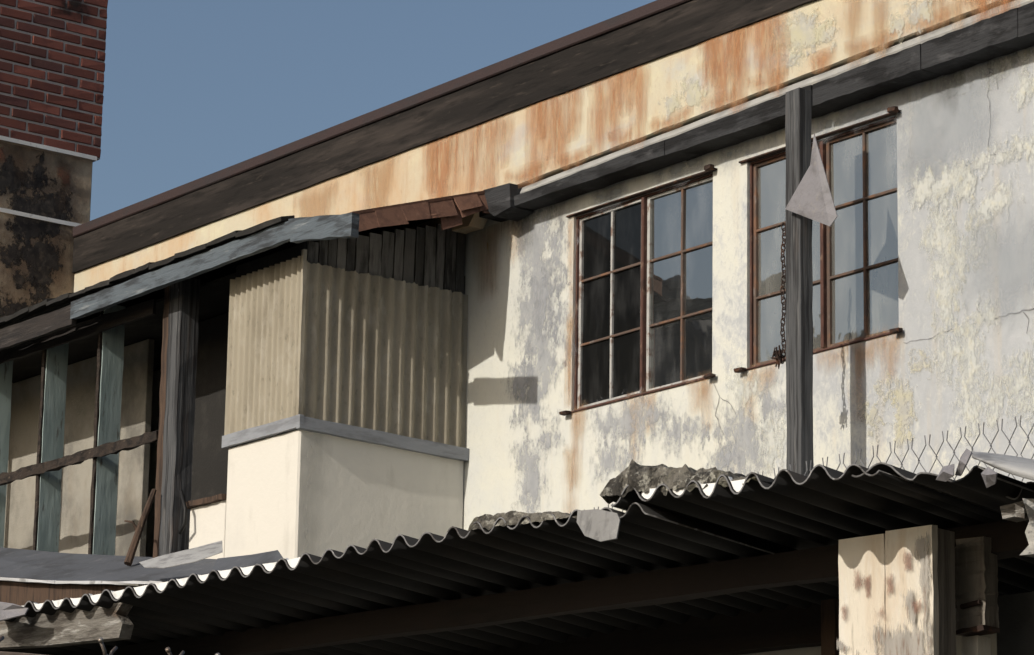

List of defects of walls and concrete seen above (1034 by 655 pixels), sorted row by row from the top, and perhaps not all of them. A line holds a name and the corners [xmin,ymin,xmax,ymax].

rust [706,29,744,104]
peeling [984,46,1034,109]
rust [430,136,458,198]
leakage [0,293,38,317]
crack [904,300,1034,343]